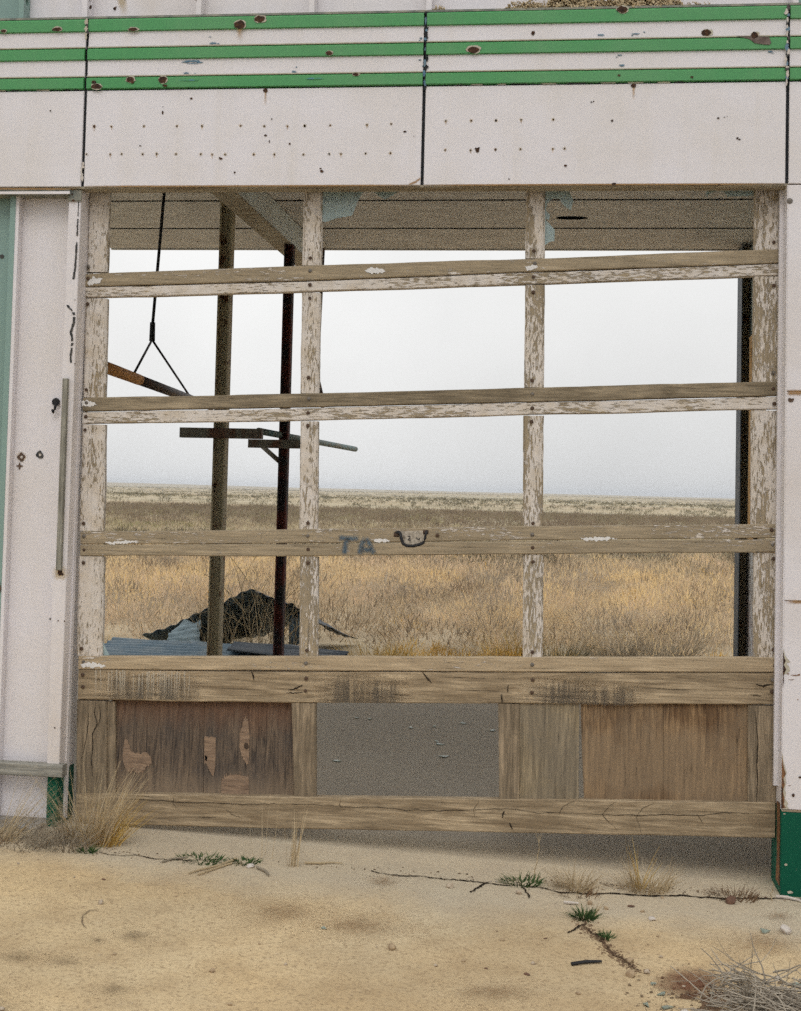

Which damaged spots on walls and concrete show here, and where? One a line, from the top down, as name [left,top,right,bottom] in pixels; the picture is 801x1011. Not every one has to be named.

rust [234,15,267,29]
rust [465,45,481,54]
crack [371,870,801,970]